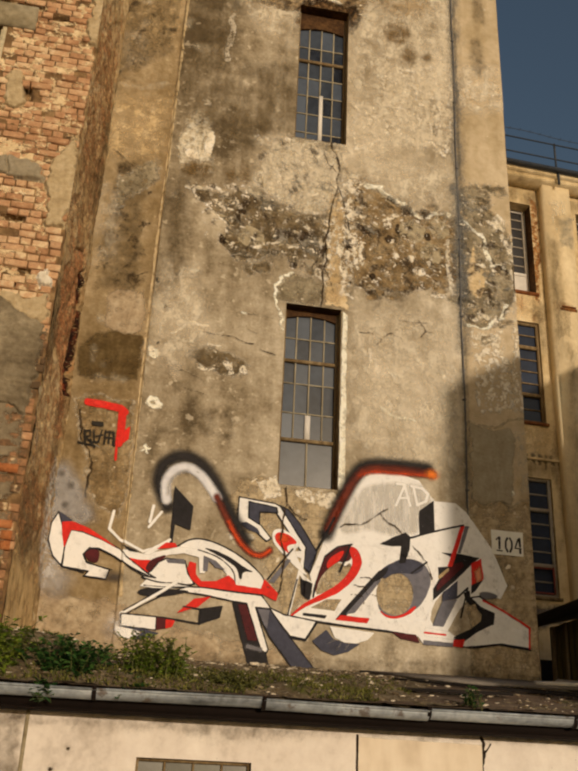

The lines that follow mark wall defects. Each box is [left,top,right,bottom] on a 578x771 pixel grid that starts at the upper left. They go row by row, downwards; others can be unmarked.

leakage [184,0,236,111]
leakage [249,1,299,42]
leakage [227,65,345,209]
crack [312,143,350,307]
leakage [156,267,208,369]
flaking render [35,0,524,615]
crack [480,736,491,771]